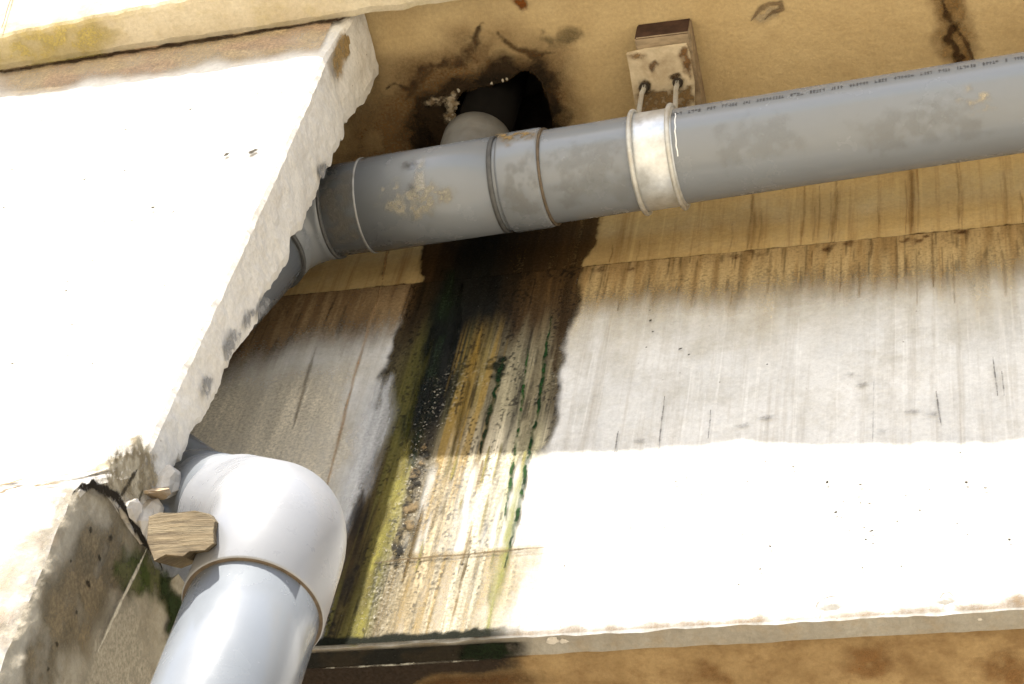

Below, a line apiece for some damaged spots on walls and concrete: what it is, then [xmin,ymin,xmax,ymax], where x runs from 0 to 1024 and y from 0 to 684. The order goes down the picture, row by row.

water stain [333,34,350,77]
water stain [347,25,581,162]
crack [0,435,163,571]
spalling [95,436,181,545]
water stain [190,217,1024,684]